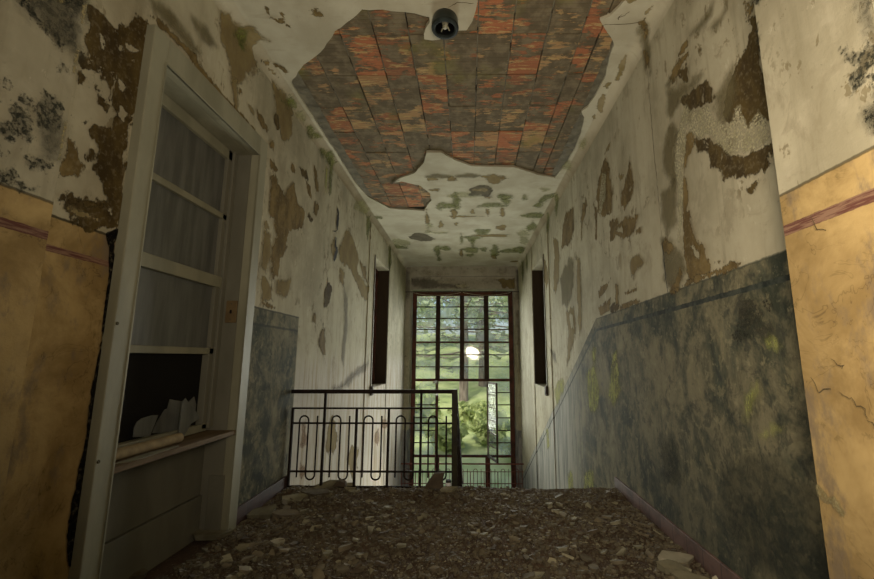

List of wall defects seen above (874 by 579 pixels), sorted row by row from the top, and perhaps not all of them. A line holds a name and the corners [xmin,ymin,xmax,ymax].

leakage [0,168,34,194]
leakage [0,90,65,170]
leakage [20,0,86,58]
peeling [59,2,268,567]
peeling [261,141,319,309]
spalling [256,0,636,208]
peeling [542,143,643,364]
peeling [667,1,769,128]
peeling [670,132,773,294]
leakage [840,42,874,91]